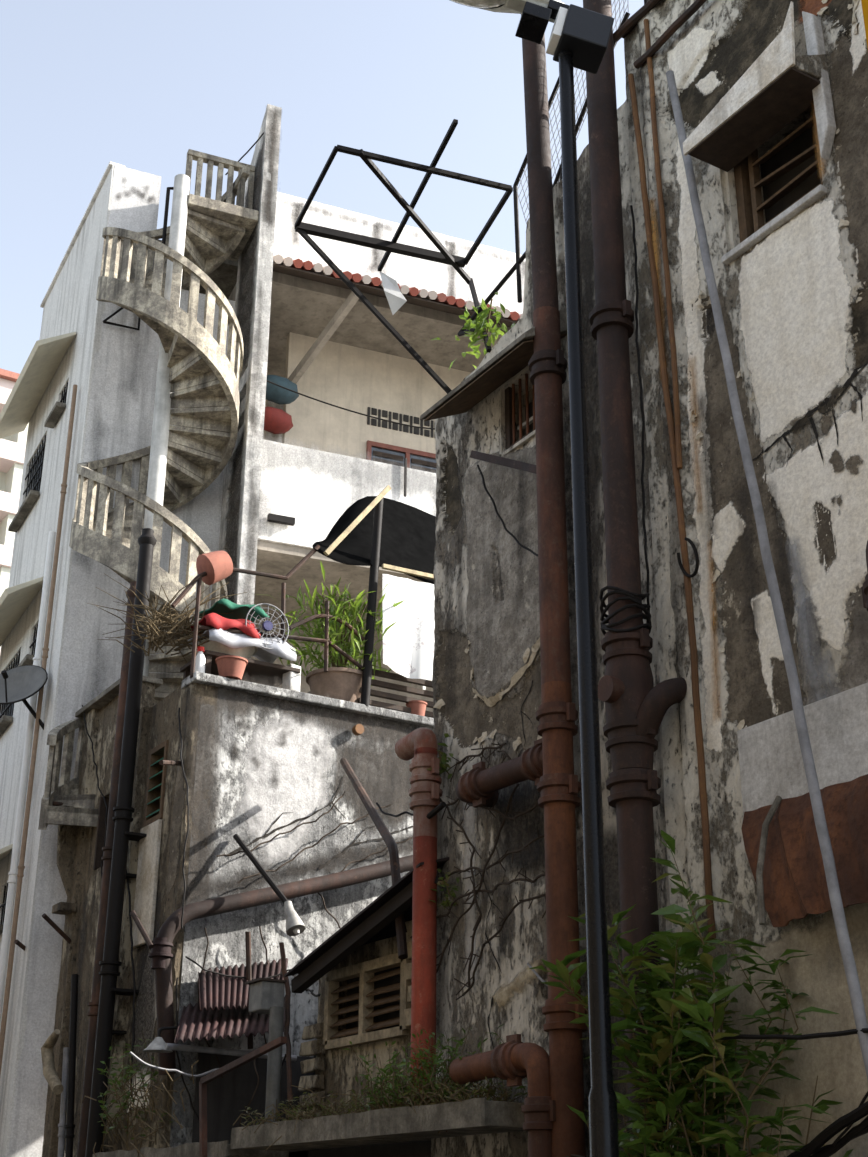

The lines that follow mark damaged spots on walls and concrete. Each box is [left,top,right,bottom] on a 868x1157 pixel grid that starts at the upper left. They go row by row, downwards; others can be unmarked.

peeling [658,0,868,753]
crack [752,364,866,466]
spalling [440,441,463,535]
spalling [433,629,542,751]
leakage [187,679,422,905]